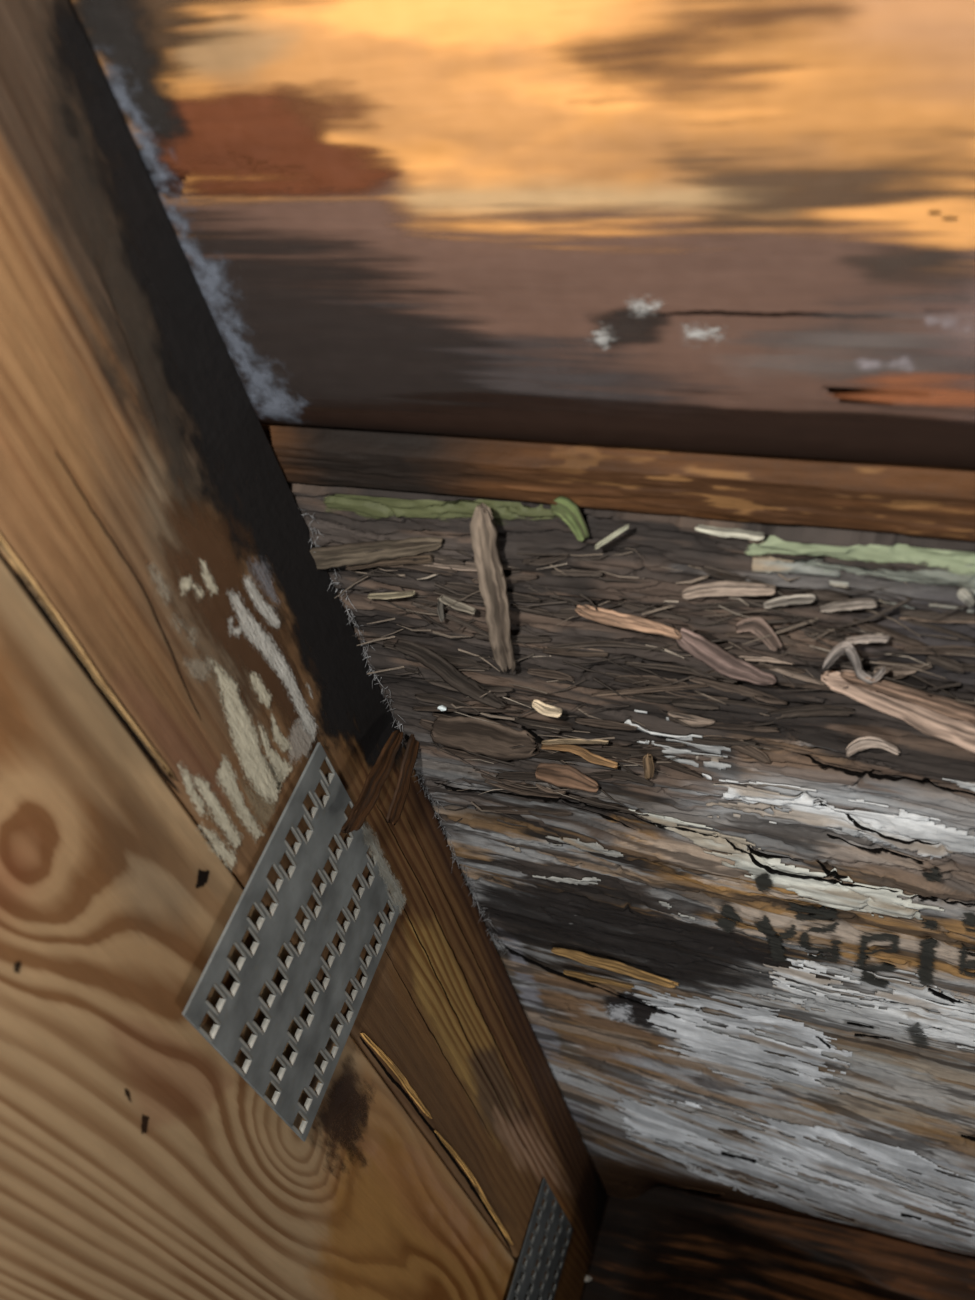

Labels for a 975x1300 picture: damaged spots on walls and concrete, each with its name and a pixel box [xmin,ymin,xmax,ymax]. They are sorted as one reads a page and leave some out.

water stain [50,0,975,870]
crack [0,552,180,794]
crack [375,803,575,1177]
crack [504,945,699,1018]
peeling [760,993,825,1012]
water stain [313,1065,368,1171]
crack [360,1037,512,1253]